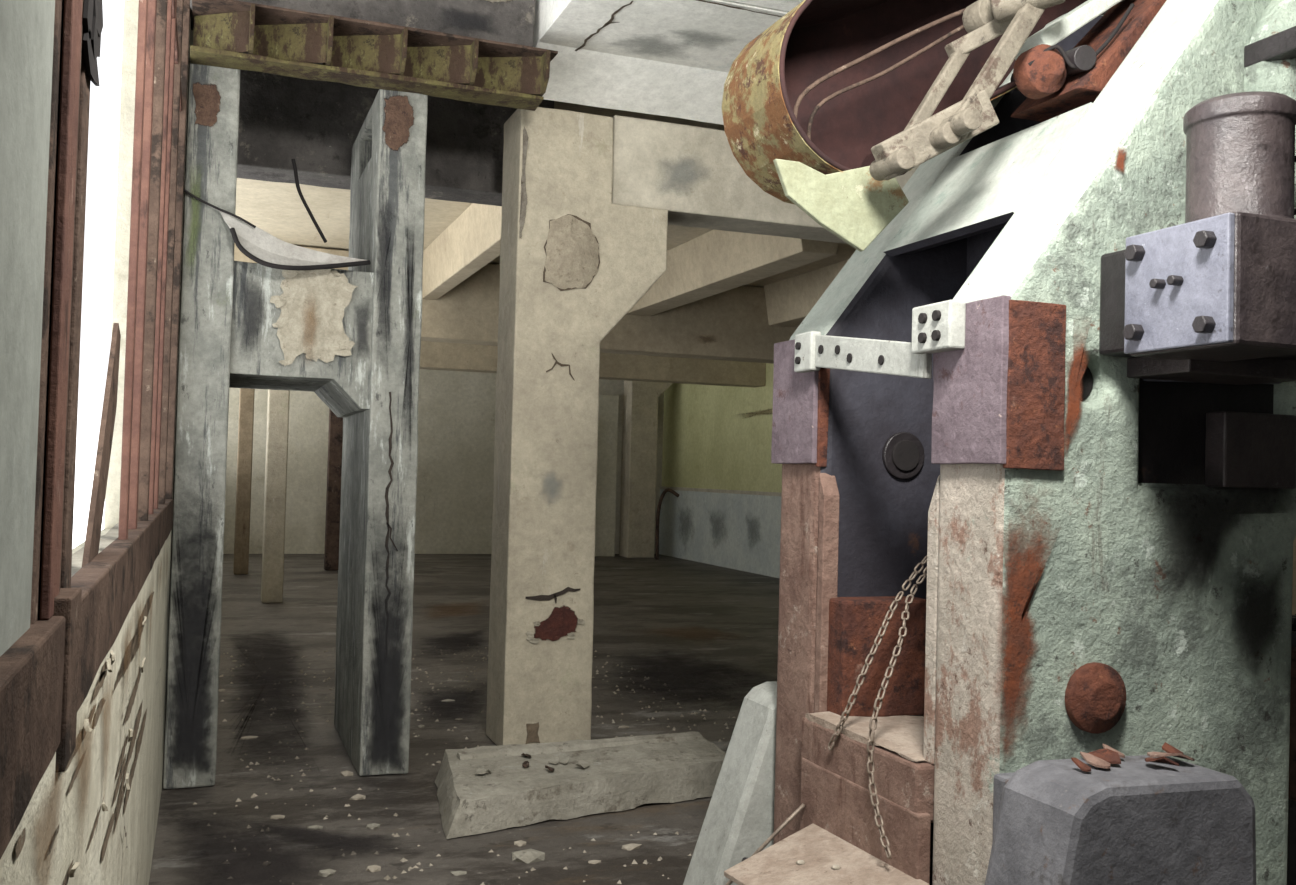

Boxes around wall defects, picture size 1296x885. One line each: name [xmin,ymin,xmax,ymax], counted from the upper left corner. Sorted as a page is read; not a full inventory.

crack [575,1,633,51]
crack [697,0,782,17]
peeling [270,269,358,366]
crack [385,392,398,610]
water stain [164,532,213,766]
water stain [372,566,402,764]
crack [525,587,580,603]
spalling [526,605,585,644]